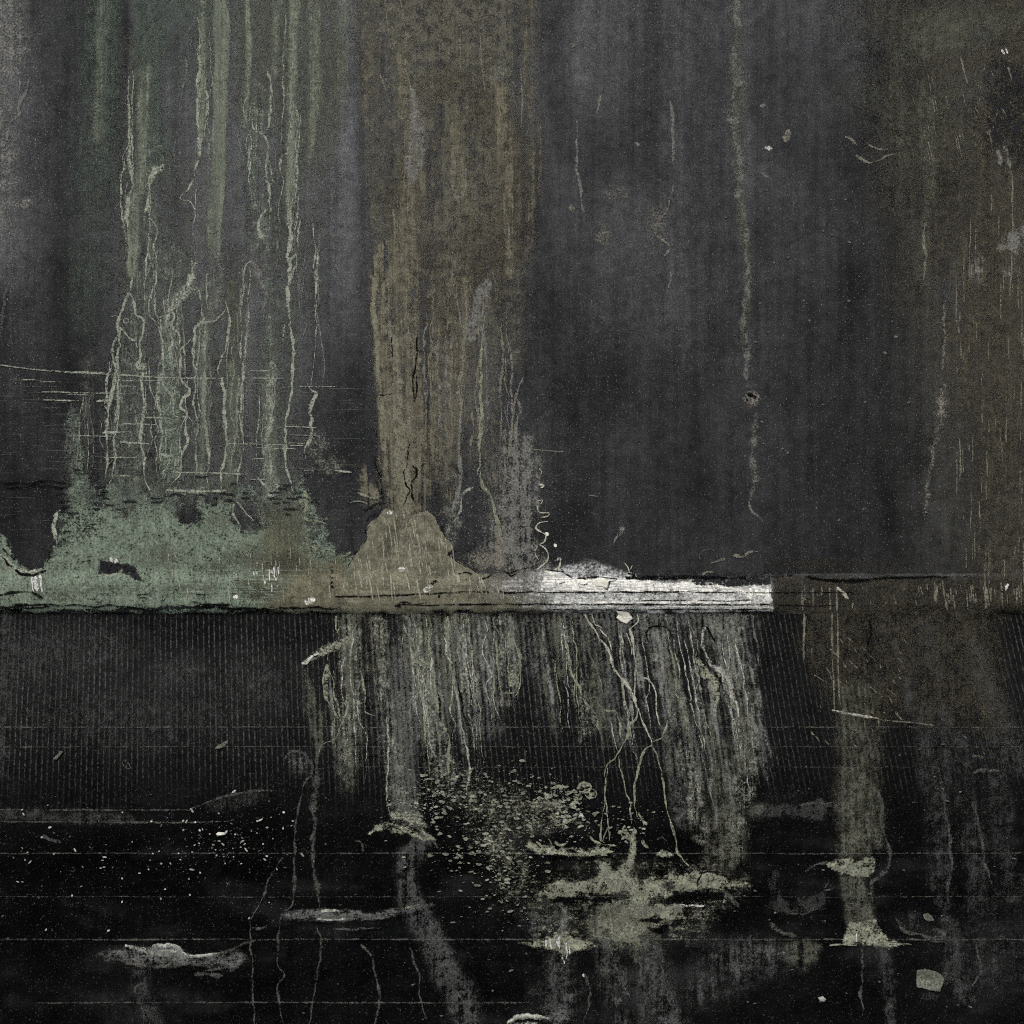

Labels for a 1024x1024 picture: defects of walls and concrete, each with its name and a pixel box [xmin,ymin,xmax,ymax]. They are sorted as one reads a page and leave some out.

water stain [31,575,43,592]
water stain [67,0,352,512]
water stain [286,0,1024,1024]